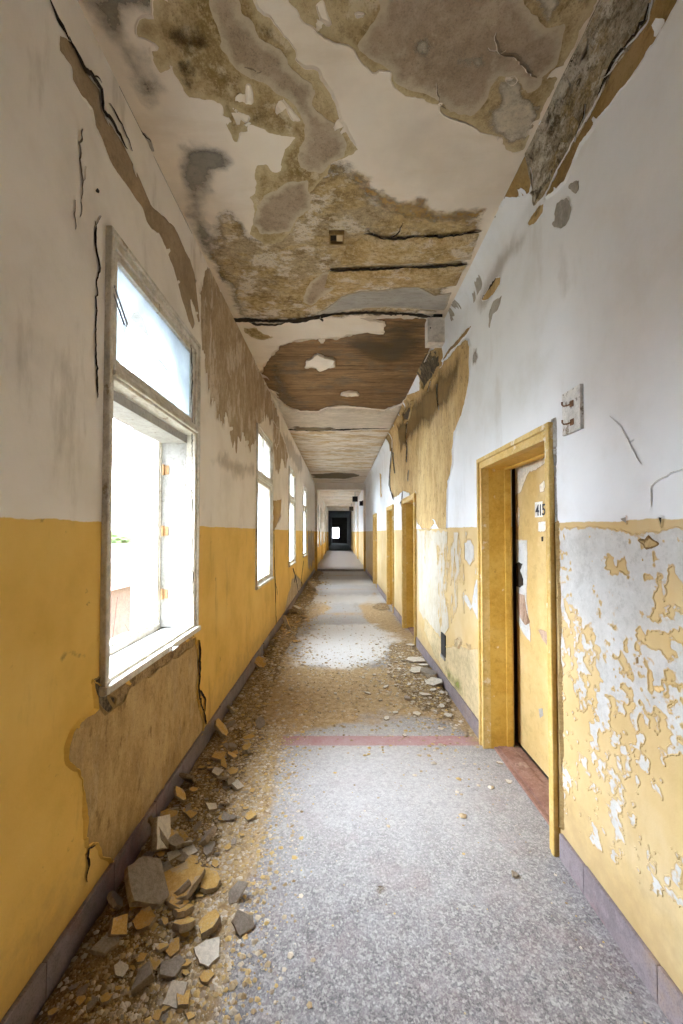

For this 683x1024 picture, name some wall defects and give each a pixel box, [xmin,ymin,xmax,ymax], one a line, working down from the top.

crack [50,0,156,160]
flaking render [287,0,678,230]
water stain [492,79,540,142]
crack [74,129,101,395]
flaking render [58,0,479,720]
water stain [184,150,477,320]
crack [234,311,433,326]
crack [330,263,467,272]
crack [364,223,482,240]
peeling [472,275,502,328]
peeling [515,417,683,908]
flaking render [64,635,205,864]